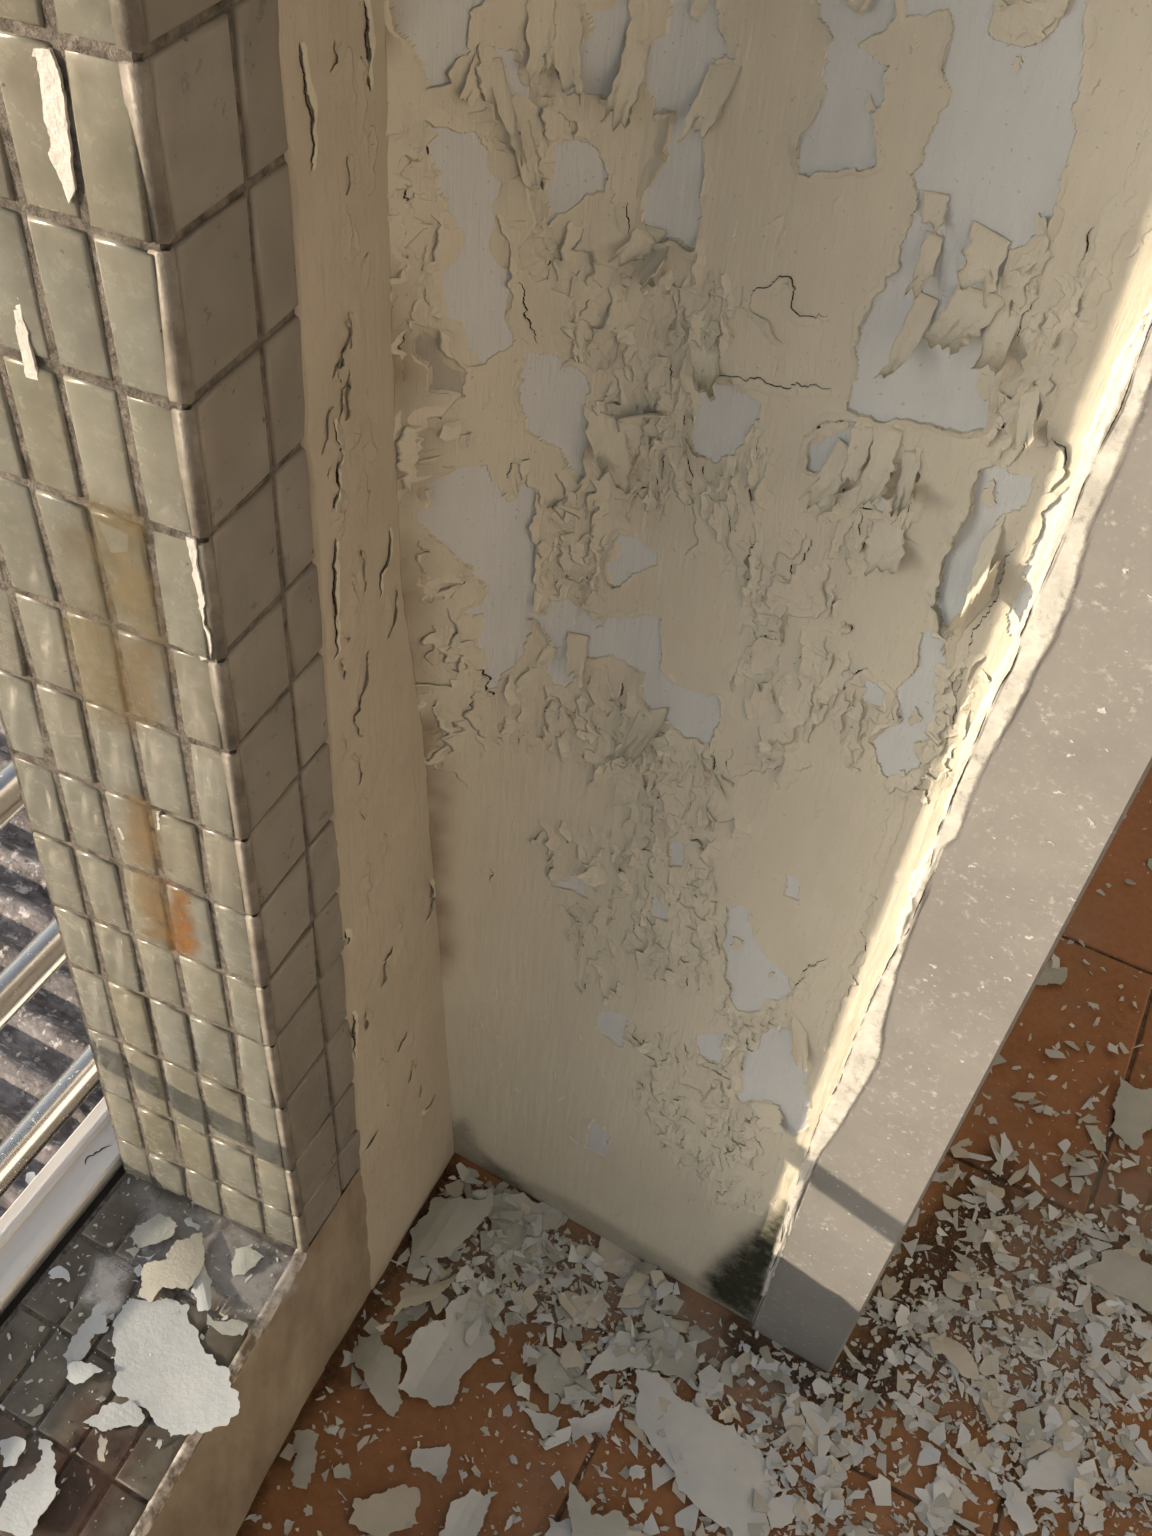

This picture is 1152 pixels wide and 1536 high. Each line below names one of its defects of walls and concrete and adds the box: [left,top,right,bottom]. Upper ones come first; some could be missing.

peeling [384,0,1102,1178]
crack [765,322,1152,1280]
crack [1066,220,1094,278]